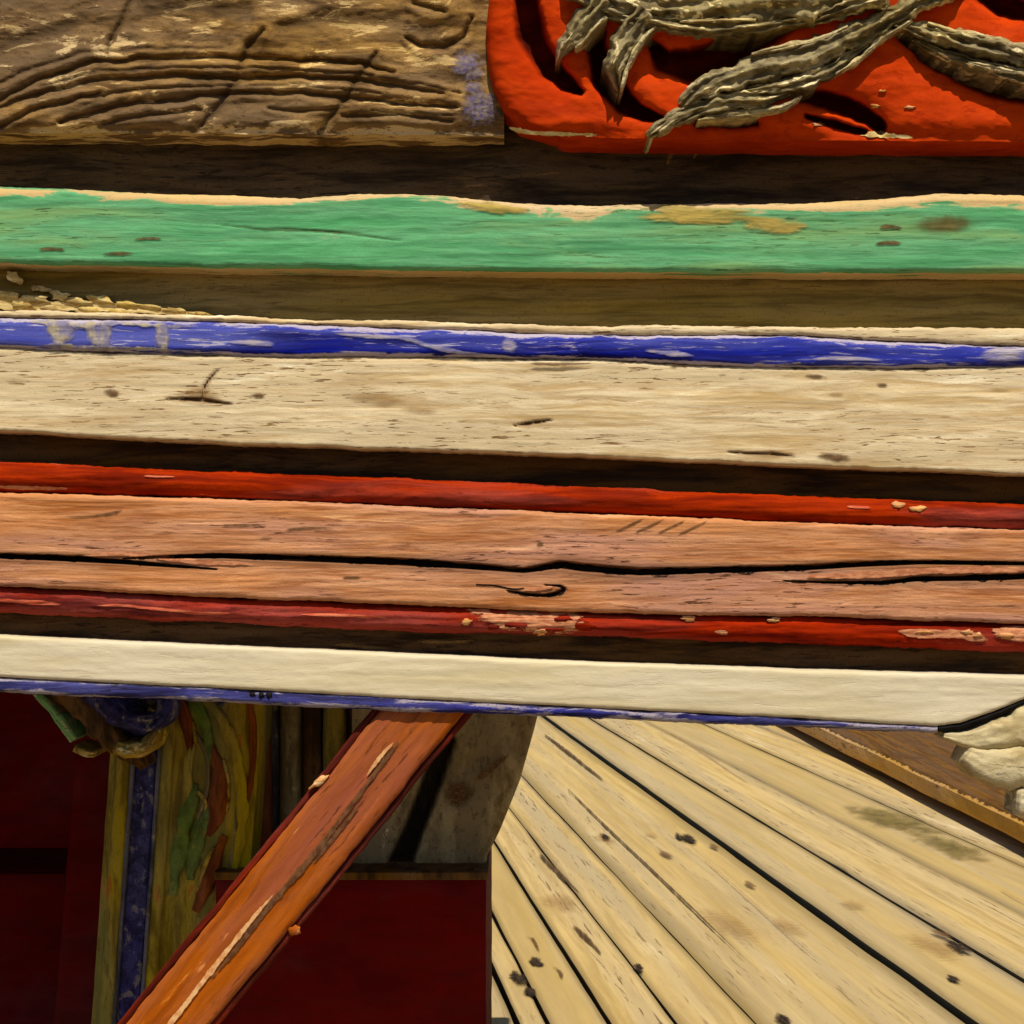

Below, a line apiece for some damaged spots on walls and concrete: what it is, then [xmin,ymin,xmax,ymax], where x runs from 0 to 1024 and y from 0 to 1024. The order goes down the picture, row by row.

peeling [460,202,525,214]
peeling [644,205,806,234]
peeling [0,271,213,353]
peeling [337,333,516,358]
crack [177,373,228,404]
crack [0,552,1024,597]
peeling [462,608,594,636]
peeling [899,626,1024,642]